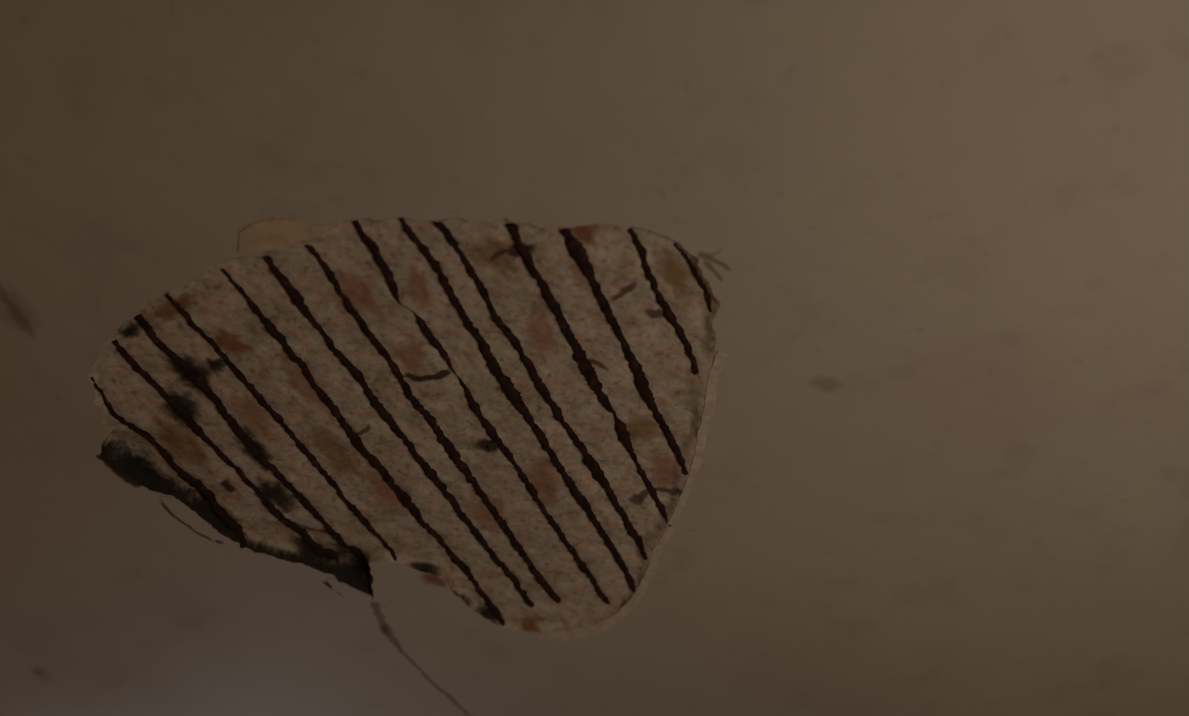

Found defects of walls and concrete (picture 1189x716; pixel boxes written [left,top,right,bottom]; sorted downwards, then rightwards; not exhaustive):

spalling [88,216,728,640]